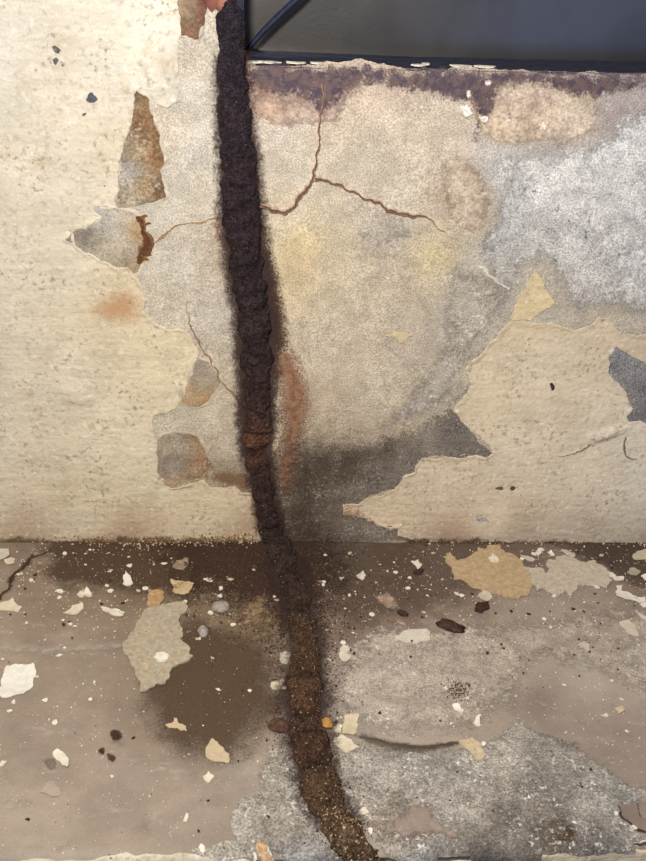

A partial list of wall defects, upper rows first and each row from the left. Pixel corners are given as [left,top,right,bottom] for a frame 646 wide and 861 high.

crack [260,84,445,232]
leakage [250,61,646,138]
peeling [61,0,253,496]
rust [266,249,311,494]
peeling [246,58,646,561]
rust [205,458,248,488]
crack [0,541,64,601]
leakage [40,541,201,607]
leakage [146,620,279,760]
spalling [191,734,343,861]
crack [358,737,459,750]
spalling [333,713,646,861]